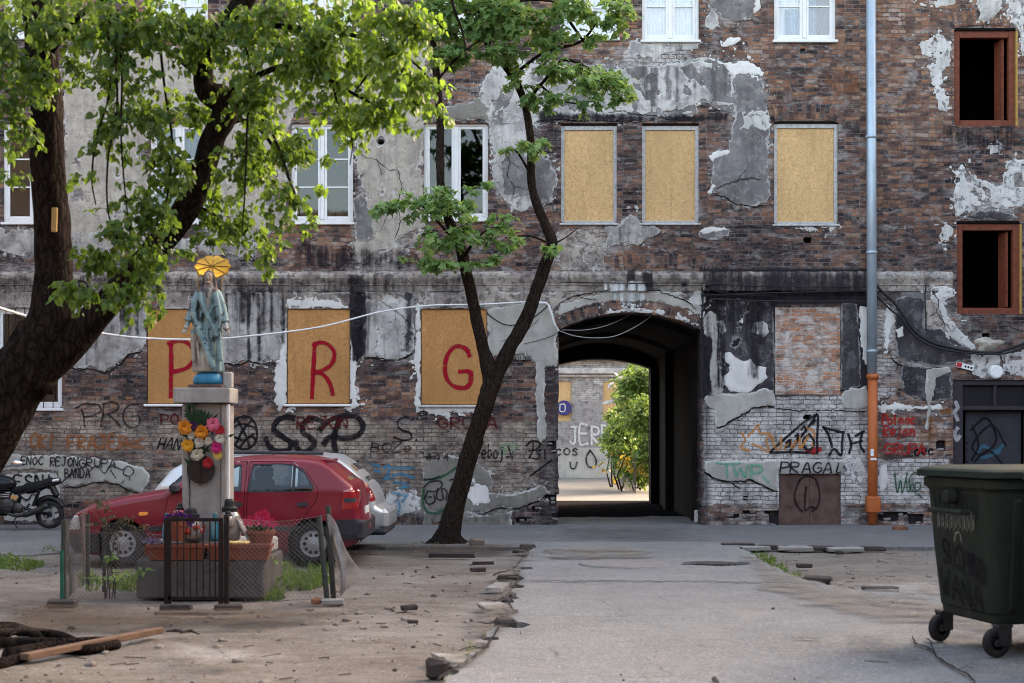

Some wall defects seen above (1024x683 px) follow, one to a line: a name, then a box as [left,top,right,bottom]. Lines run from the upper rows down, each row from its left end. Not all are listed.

peeling [912,29,954,117]
peeling [173,0,778,272]
crack [712,170,764,208]
peeling [934,141,1024,251]
peeling [0,225,35,268]
peeling [0,291,32,308]
water stain [218,279,309,361]
peeling [221,289,775,453]
water stain [702,266,893,396]
peeling [385,452,459,525]
peeling [462,454,558,525]